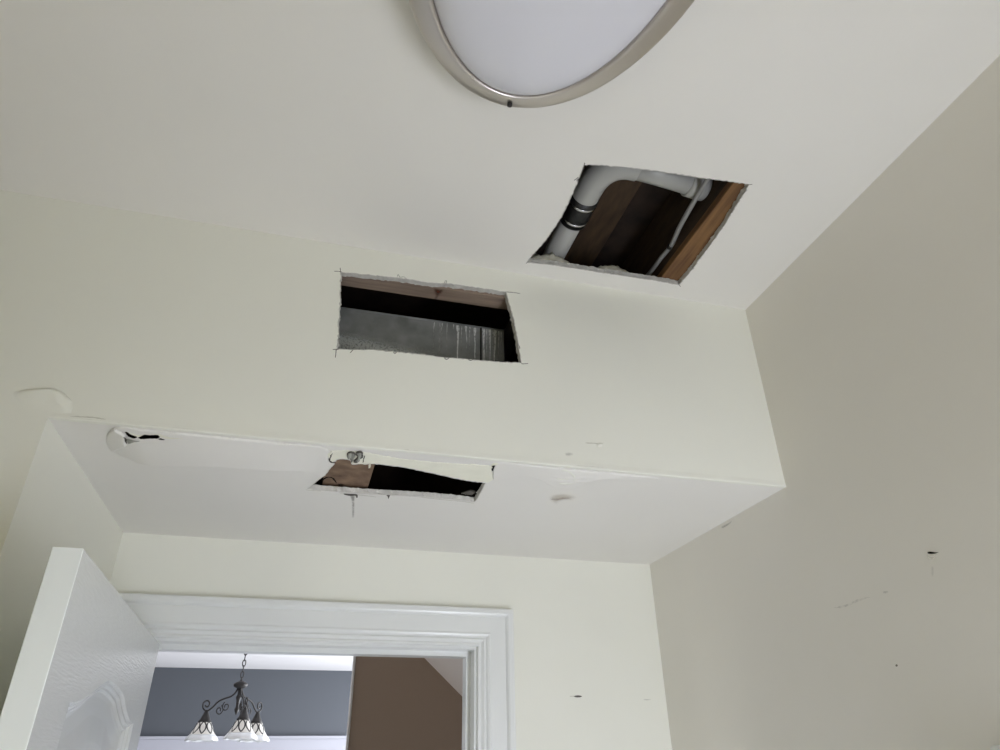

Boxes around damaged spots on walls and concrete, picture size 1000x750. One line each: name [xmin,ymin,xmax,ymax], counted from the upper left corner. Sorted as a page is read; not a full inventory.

spalling [328,450,499,497]